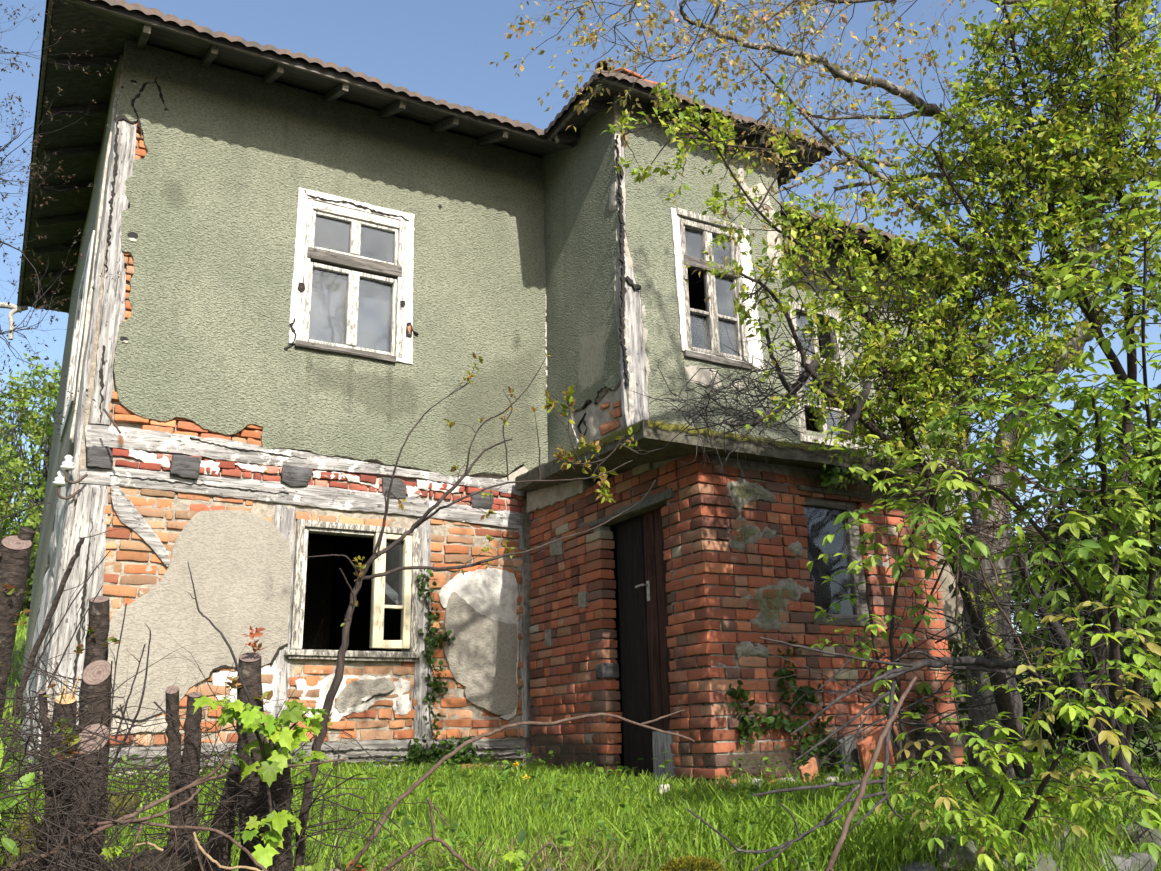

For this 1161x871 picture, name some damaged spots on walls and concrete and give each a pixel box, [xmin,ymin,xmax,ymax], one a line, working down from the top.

crack [105,77,167,271]
flaking render [608,182,626,212]
flaking render [615,226,633,301]
flaking render [575,302,651,444]